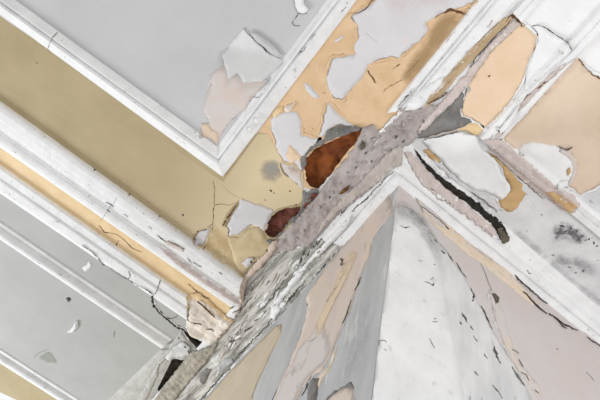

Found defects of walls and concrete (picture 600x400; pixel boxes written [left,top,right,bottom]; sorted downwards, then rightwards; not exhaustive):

peeling [138,0,600,400]
crack [415,150,510,244]
water stain [555,227,582,242]
crack [83,245,187,332]
crack [515,275,600,346]